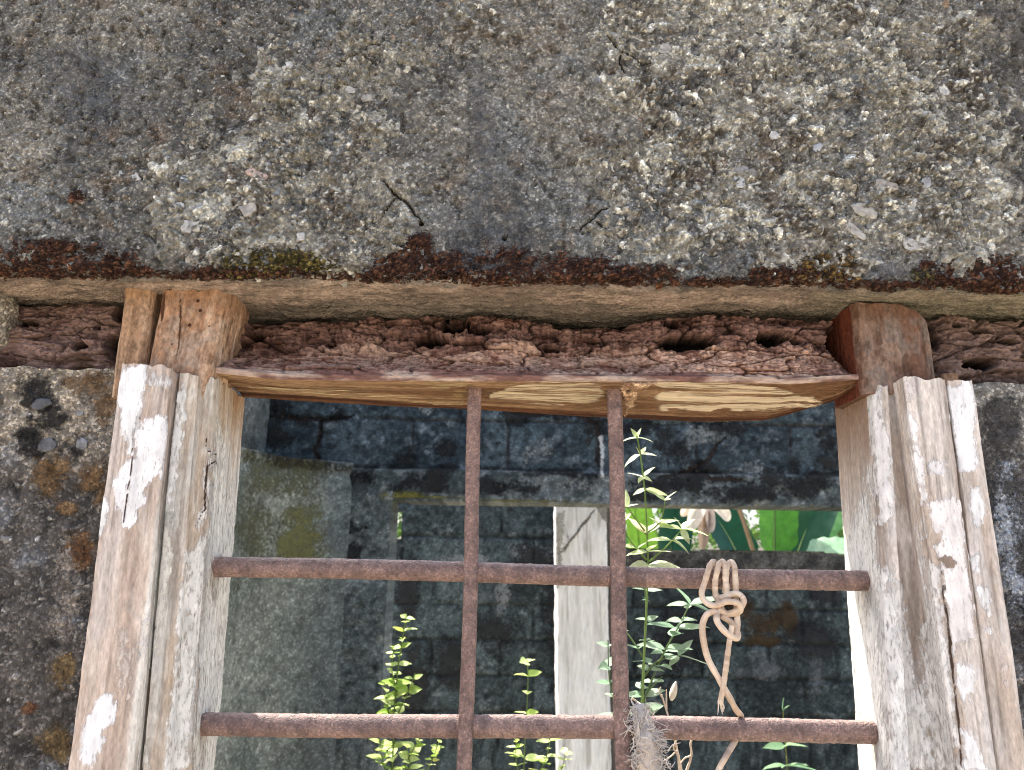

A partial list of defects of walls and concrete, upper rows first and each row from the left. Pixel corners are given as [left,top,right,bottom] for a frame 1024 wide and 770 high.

corrosion [68,187,88,205]
crack [382,182,422,224]
corrosion [0,230,1024,295]
crack [197,438,217,523]
peeling [79,364,236,770]
peeling [844,380,992,770]